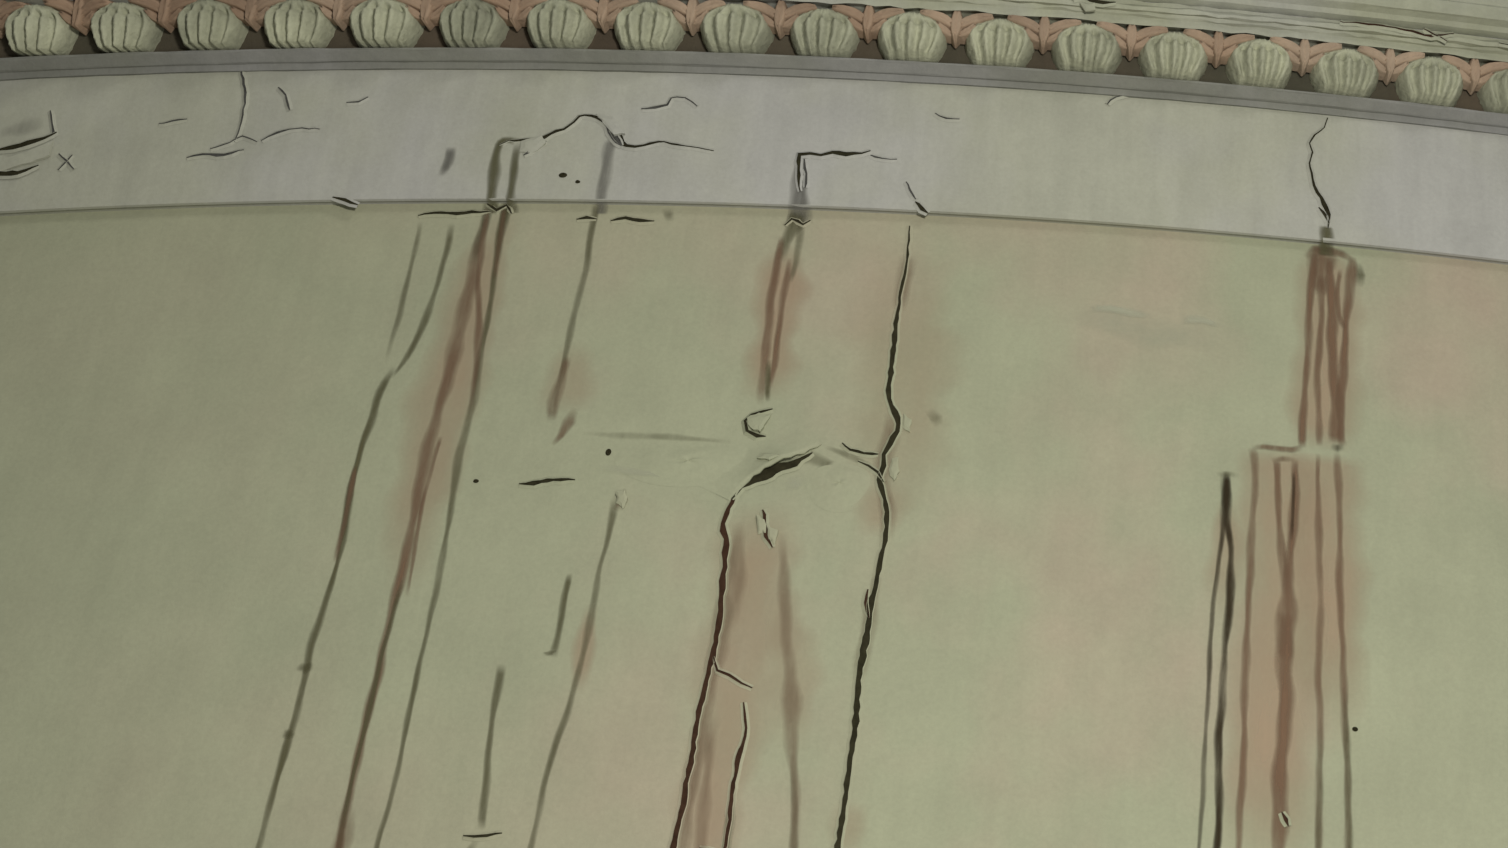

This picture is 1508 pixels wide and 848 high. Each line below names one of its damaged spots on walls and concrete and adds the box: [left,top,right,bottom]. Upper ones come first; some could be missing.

crack [499,95,714,158]
crack [331,195,360,208]
crack [418,209,492,219]
crack [577,214,655,225]
crack [1306,117,1333,255]
rust [763,246,791,396]
flaking render [699,407,822,500]
flaking render [756,509,778,549]
crack [794,149,930,848]
rust [1238,247,1355,848]
rust [337,346,458,848]